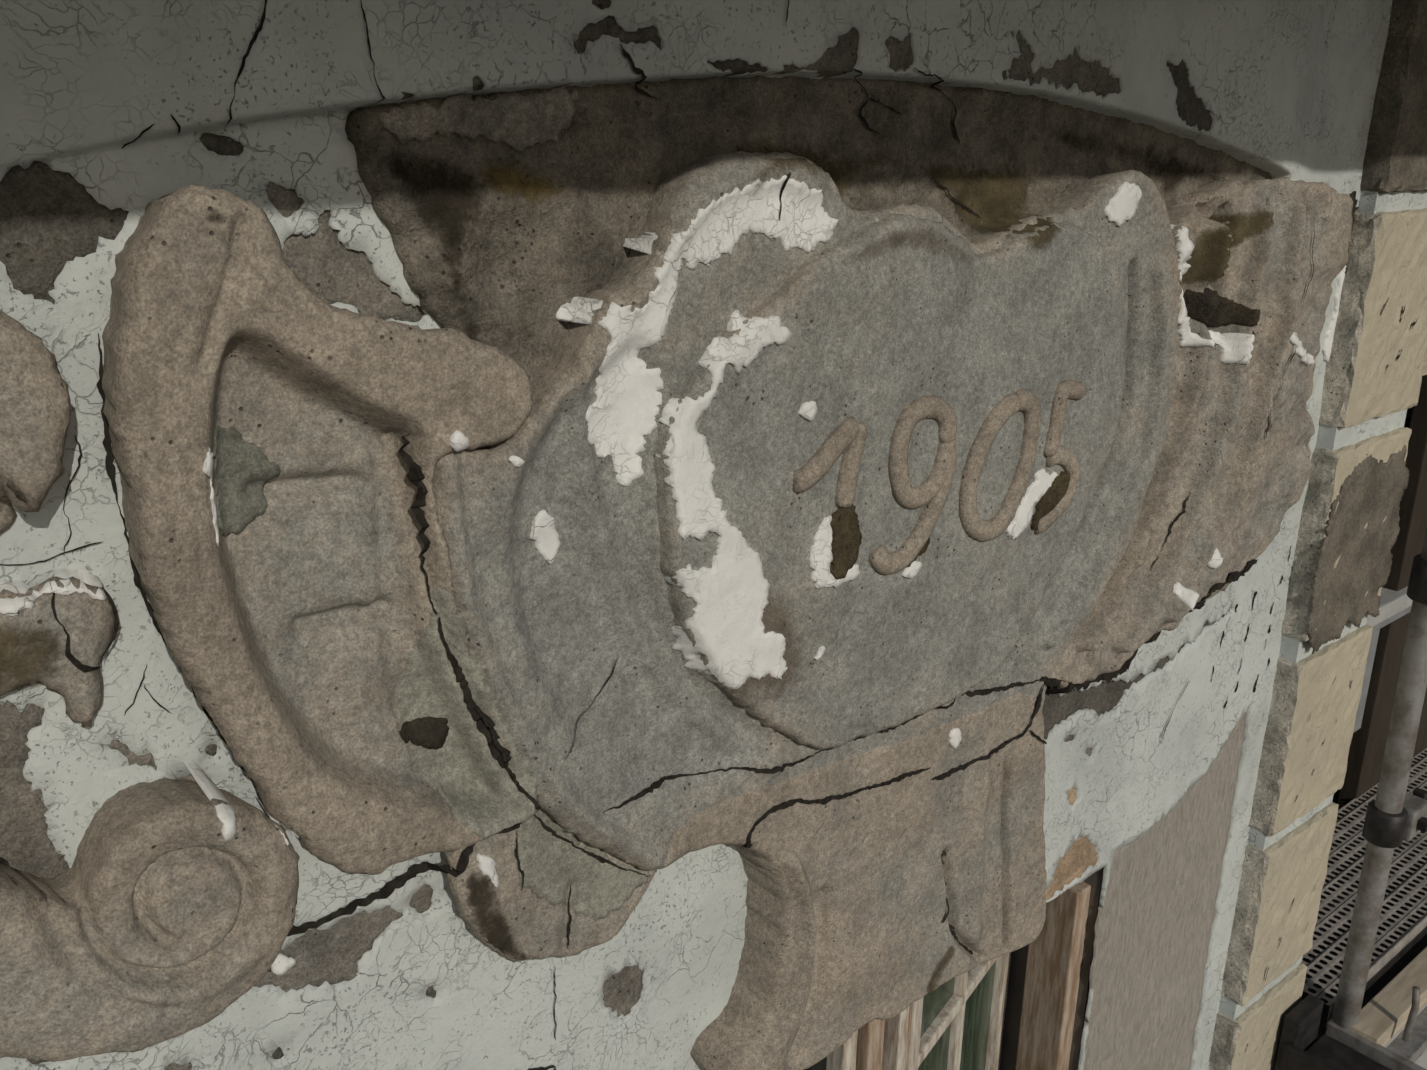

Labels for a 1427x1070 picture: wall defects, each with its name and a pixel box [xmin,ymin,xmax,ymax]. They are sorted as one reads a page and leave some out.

crack [224,0,267,132]
crack [620,44,657,99]
peeling [0,161,129,304]
crack [779,172,791,217]
spalling [1171,224,1260,364]
peeling [556,175,839,689]
spalling [0,700,69,878]
crack [287,434,648,937]
peeling [395,587,649,921]
crack [605,559,1258,848]
spalling [254,884,433,992]
crack [530,886,572,1070]